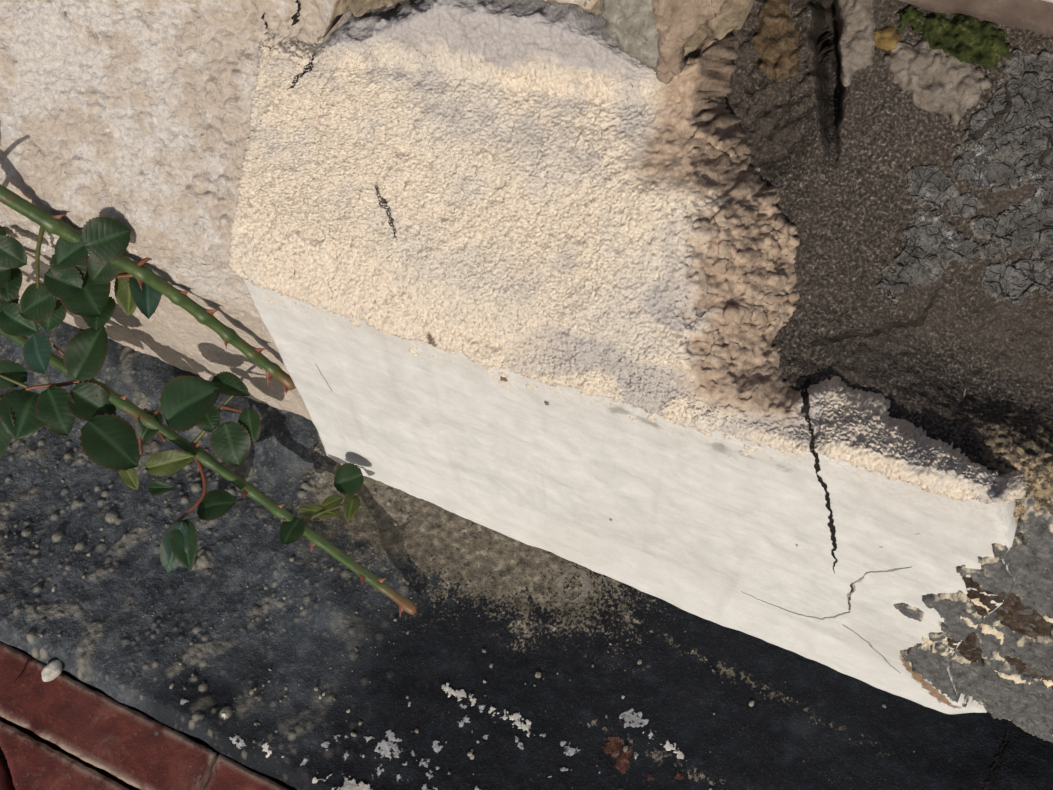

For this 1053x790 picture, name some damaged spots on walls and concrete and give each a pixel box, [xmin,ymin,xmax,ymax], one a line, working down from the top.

crack [261,0,301,29]
crack [287,47,323,90]
spalling [317,0,404,42]
spalling [547,0,659,72]
peeling [874,38,1053,305]
crack [741,377,911,673]
peeling [893,486,1053,742]